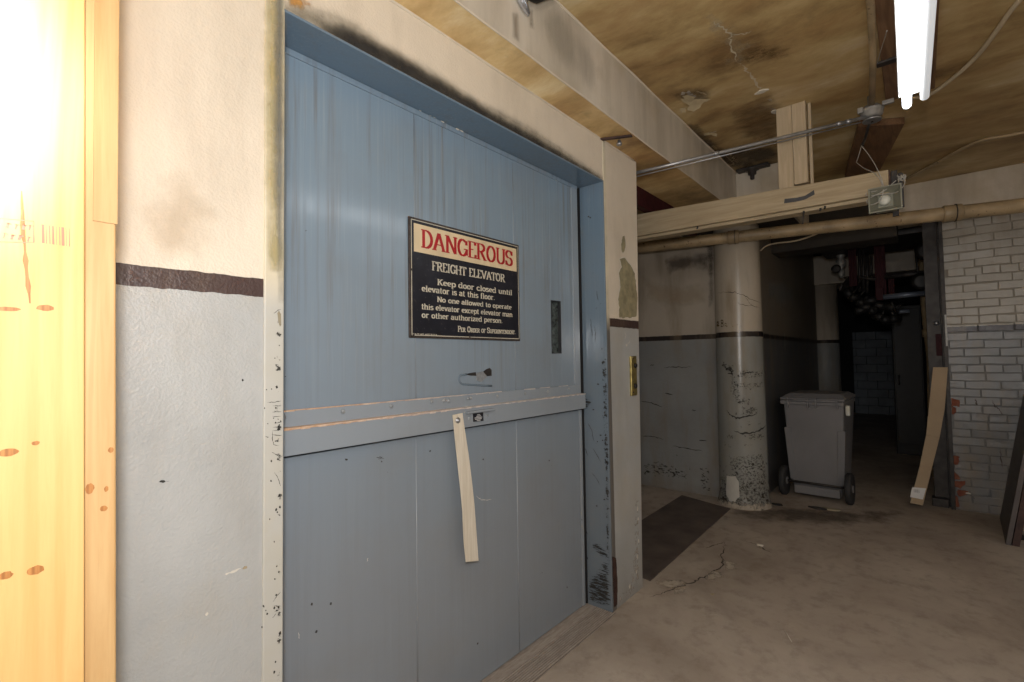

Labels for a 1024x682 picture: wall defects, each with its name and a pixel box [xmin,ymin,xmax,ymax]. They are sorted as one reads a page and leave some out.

damp [269,0,282,265]
peeling [680,91,710,113]
crack [714,21,776,114]
peeling [618,236,638,318]
spalling [700,468,772,511]
crack [652,542,725,597]